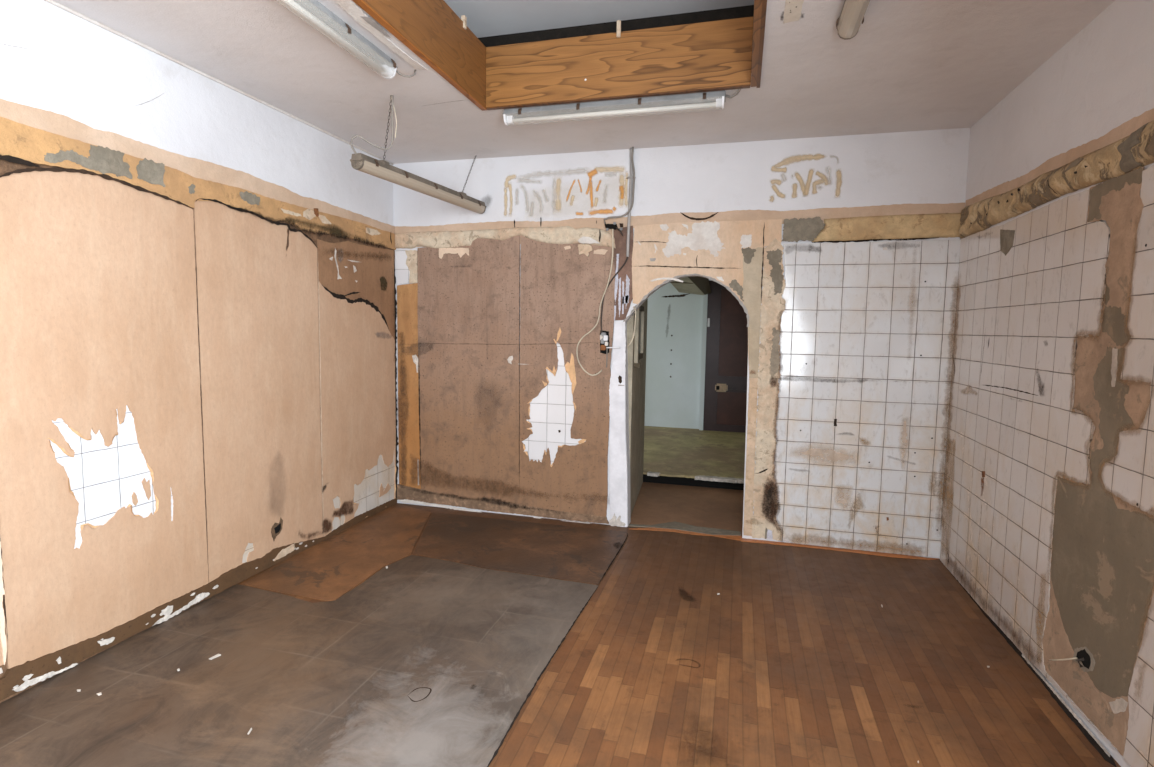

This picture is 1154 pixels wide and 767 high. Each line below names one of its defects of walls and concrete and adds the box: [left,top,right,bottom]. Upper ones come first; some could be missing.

spalling [281,208,331,224]
peeling [317,228,418,339]
spalling [1073,167,1151,485]
peeling [522,328,586,467]
peeling [48,405,173,549]
peeling [331,455,480,532]
damp [762,481,777,524]
peeling [146,585,218,626]
spalling [1042,476,1154,756]
peeling [13,657,78,692]